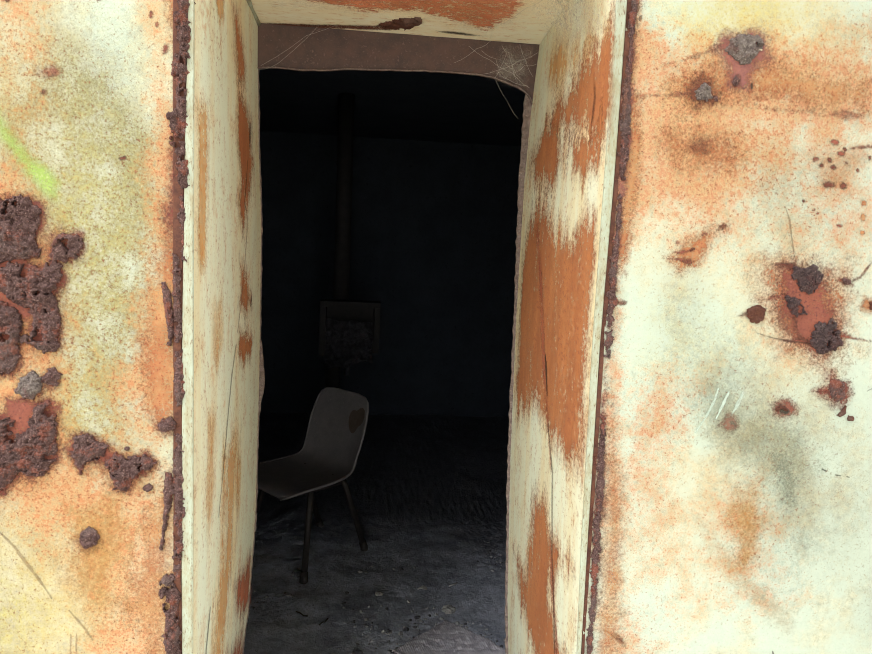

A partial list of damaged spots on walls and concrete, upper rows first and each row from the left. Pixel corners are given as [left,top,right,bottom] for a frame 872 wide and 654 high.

rust [0,0,207,654]
rust [234,10,254,232]
rust [239,266,252,316]
rust [317,0,522,31]
rust [516,0,643,469]
rust [668,223,728,274]
rust [656,29,872,118]
rust [741,251,872,421]
rust [813,139,872,170]
rust [208,433,251,654]
rust [513,492,574,654]
rust [586,397,625,654]